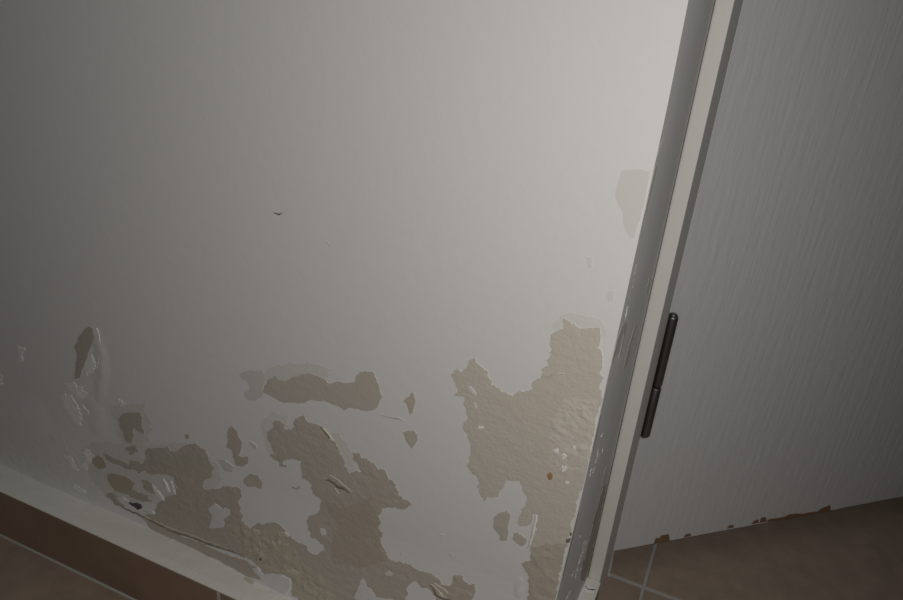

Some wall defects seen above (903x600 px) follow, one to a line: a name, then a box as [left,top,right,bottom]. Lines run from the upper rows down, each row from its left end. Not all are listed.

flaking render [74,326,100,379]
peeling [263,371,382,411]
peeling [452,318,637,600]
crack [111,498,245,558]
peeling [81,412,477,600]